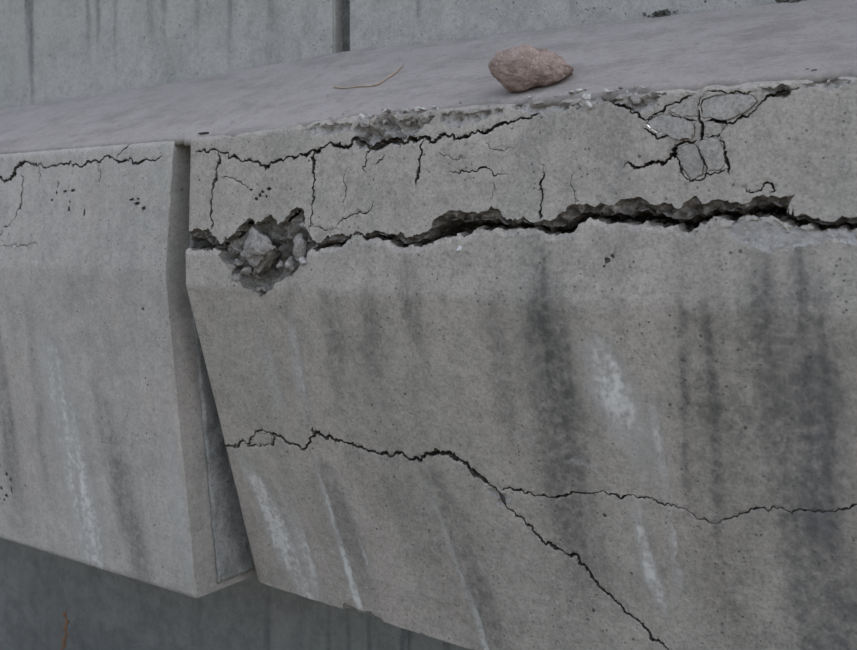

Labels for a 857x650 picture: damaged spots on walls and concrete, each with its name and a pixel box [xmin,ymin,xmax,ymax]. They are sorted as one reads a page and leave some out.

crack [0,145,164,247]
spalling [218,211,318,297]
spalling [305,108,503,152]
crack [188,89,857,251]
spalling [514,92,669,114]
spalling [761,79,853,98]
damp [589,338,667,476]
damp [241,462,320,601]
damp [319,475,363,611]
damp [432,498,489,650]
crack [226,427,857,650]
damp [635,515,667,613]